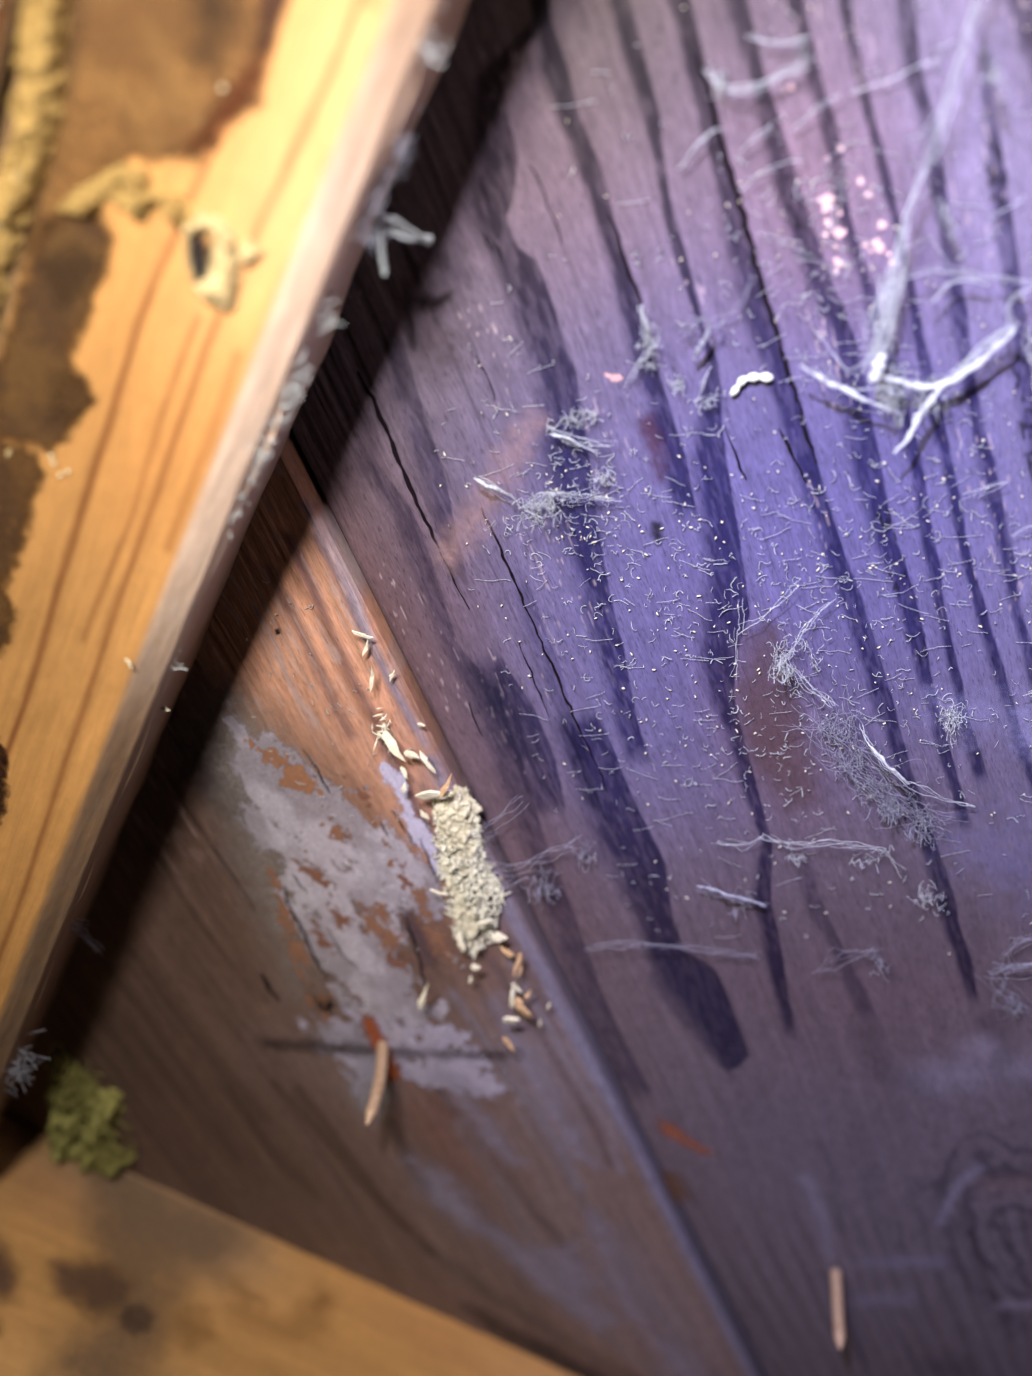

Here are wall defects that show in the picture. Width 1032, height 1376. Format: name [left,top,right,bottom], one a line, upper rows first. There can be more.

damp [0,0,284,648]
crack [357,371,470,610]
peeling [244,738,371,843]
peeling [265,837,463,1035]